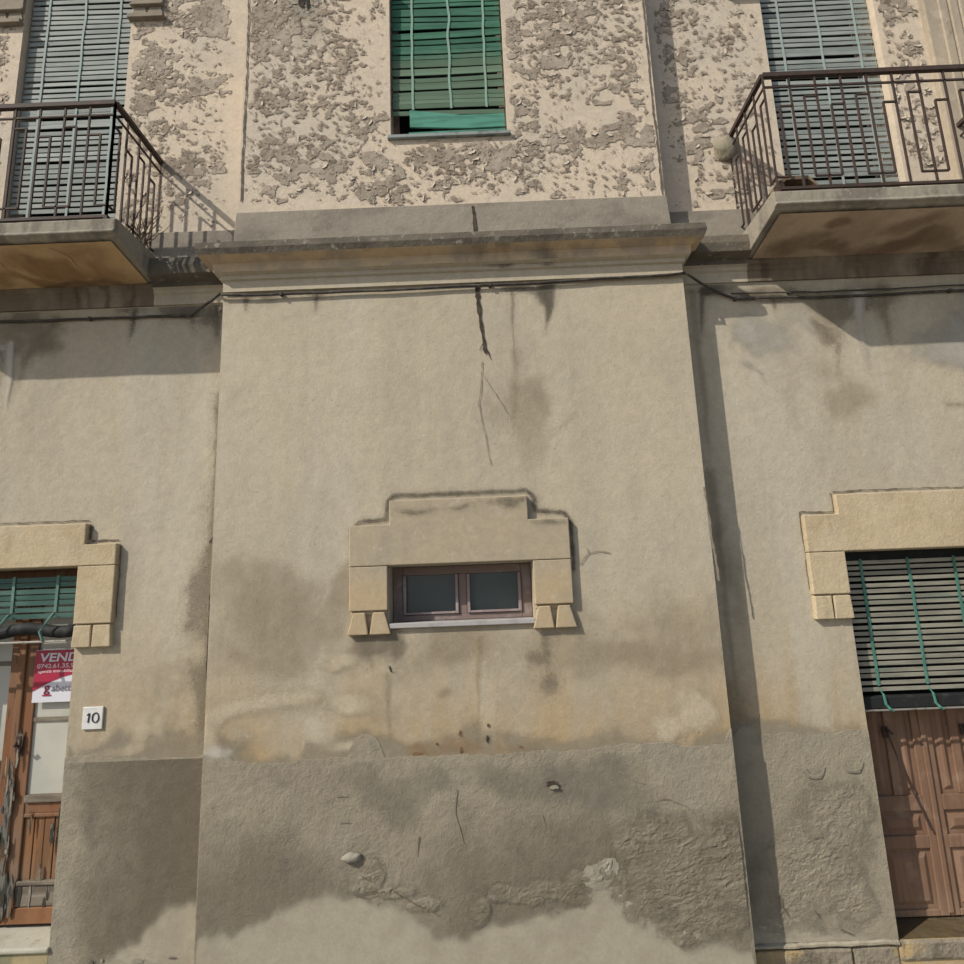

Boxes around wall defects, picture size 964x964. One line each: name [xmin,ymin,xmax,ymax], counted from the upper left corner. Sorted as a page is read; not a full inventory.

peeling [0,14,16,79]
peeling [117,0,234,231]
peeling [244,0,656,206]
peeling [654,0,779,207]
peeling [878,0,945,179]
crack [470,206,478,232]
water stain [0,311,72,412]
crack [475,283,511,465]
water stain [692,277,964,388]
water stain [66,383,867,764]
spalling [344,853,446,915]
water stain [97,878,897,964]